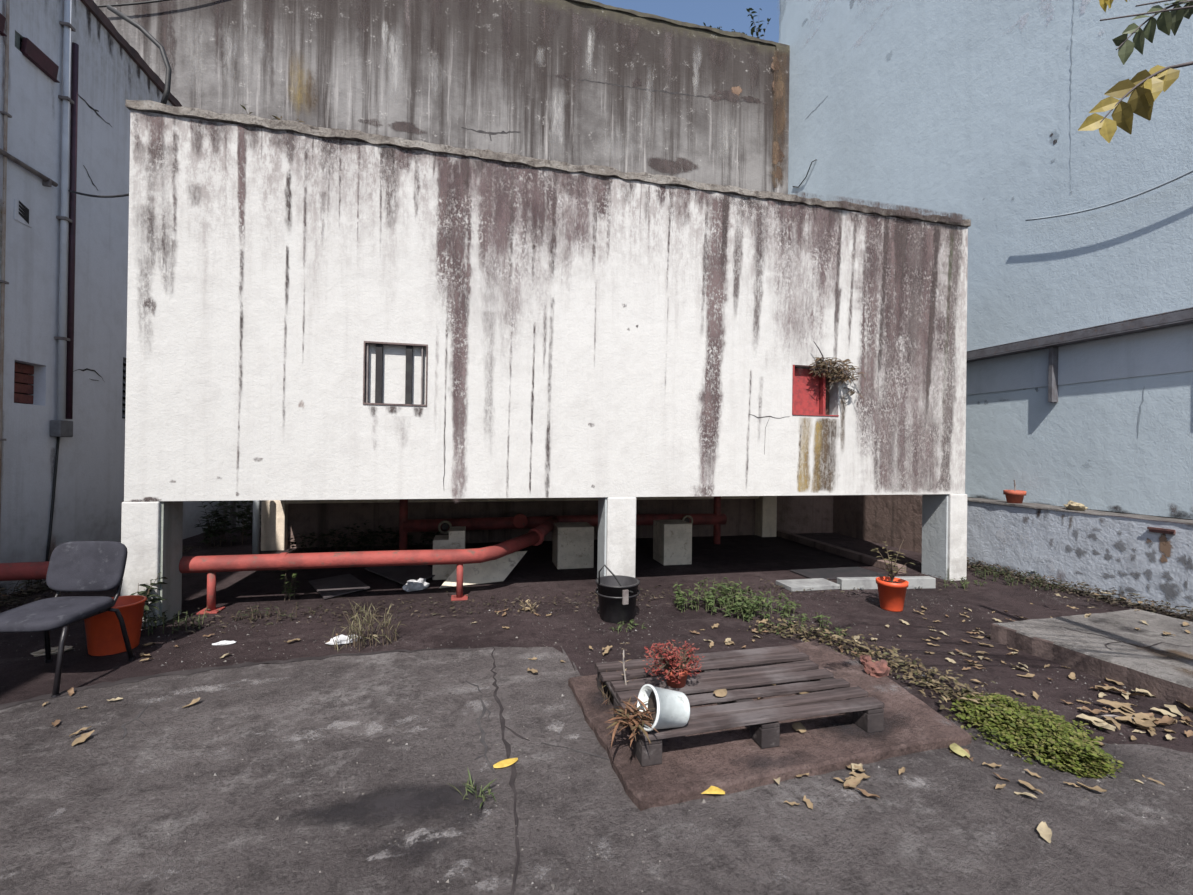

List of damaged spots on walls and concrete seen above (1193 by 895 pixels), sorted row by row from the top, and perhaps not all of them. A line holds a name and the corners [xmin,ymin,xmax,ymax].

damp [382,22,399,92]
damp [135,113,178,179]
damp [149,194,176,249]
damp [238,123,262,234]
damp [285,175,306,227]
damp [282,131,360,185]
damp [360,120,425,134]
damp [380,147,612,496]
damp [626,158,965,554]
corrosion [798,396,845,492]
peeling [1067,527,1193,601]
crack [0,646,528,895]